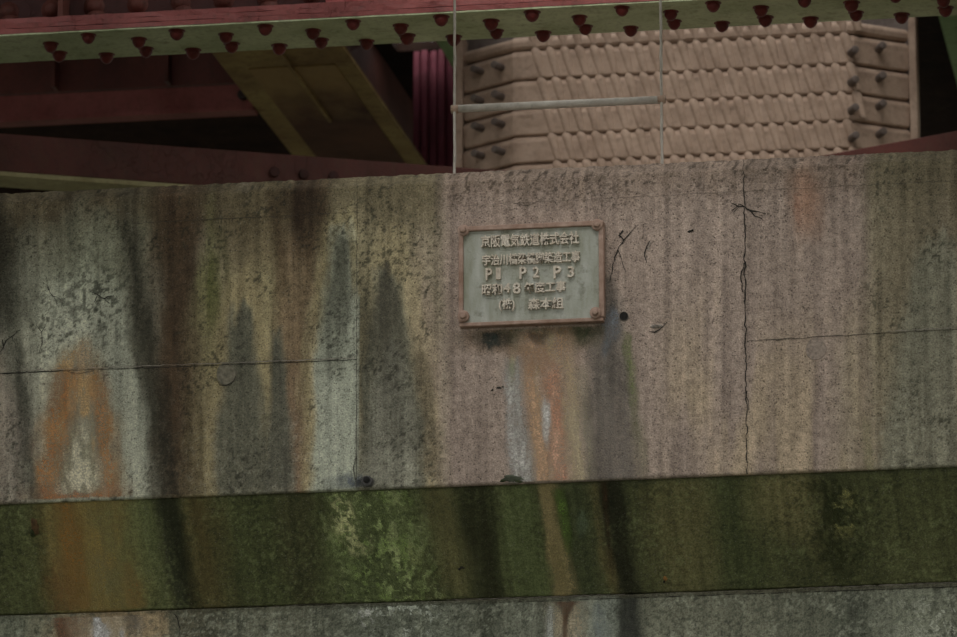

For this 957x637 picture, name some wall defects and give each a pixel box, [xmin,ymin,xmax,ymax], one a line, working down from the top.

crack [610,230,651,280]
crack [723,160,957,474]
corrosion [37,343,114,499]